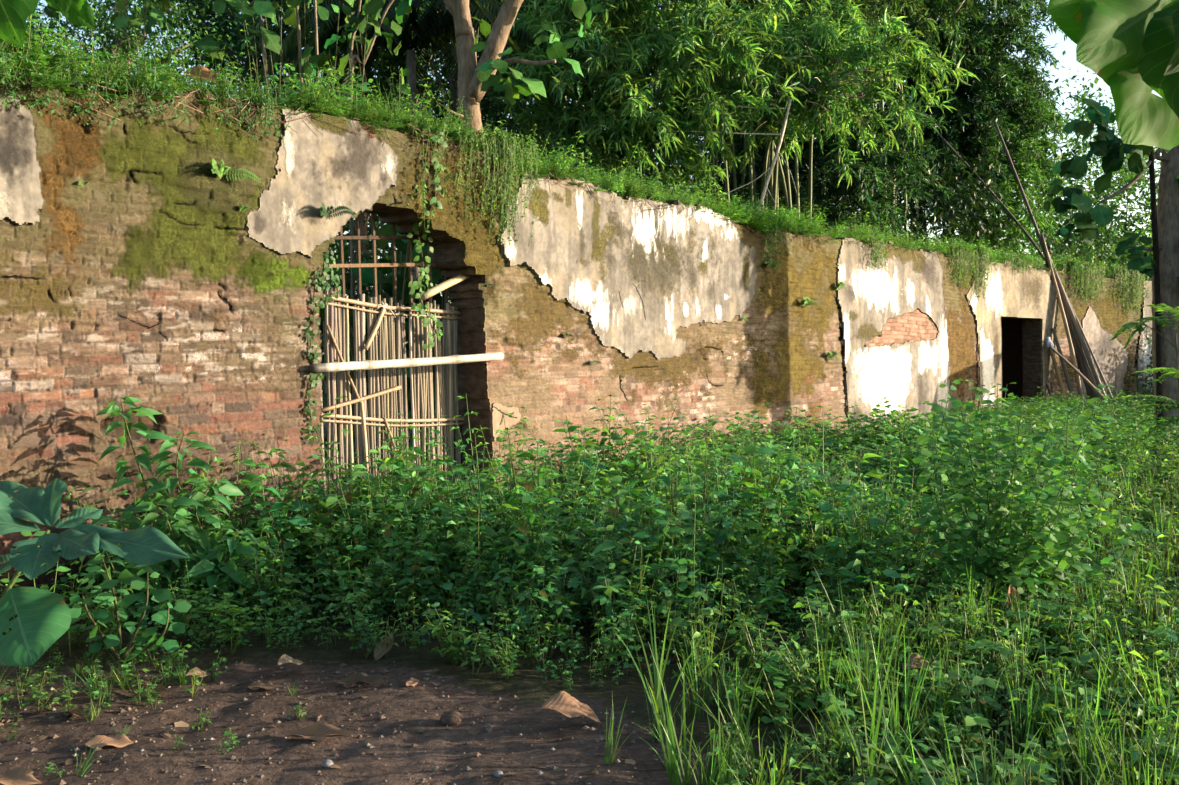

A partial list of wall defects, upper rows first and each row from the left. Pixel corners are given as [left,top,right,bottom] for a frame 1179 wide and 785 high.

water stain [0,109,31,177]
flaking render [0,91,45,226]
water stain [255,214,265,233]
water stain [284,125,294,174]
flaking render [245,106,398,258]
water stain [332,135,371,181]
flaking render [497,169,757,360]
flaking render [836,237,952,434]
flaking render [965,260,1058,414]
flaking render [1076,280,1154,404]